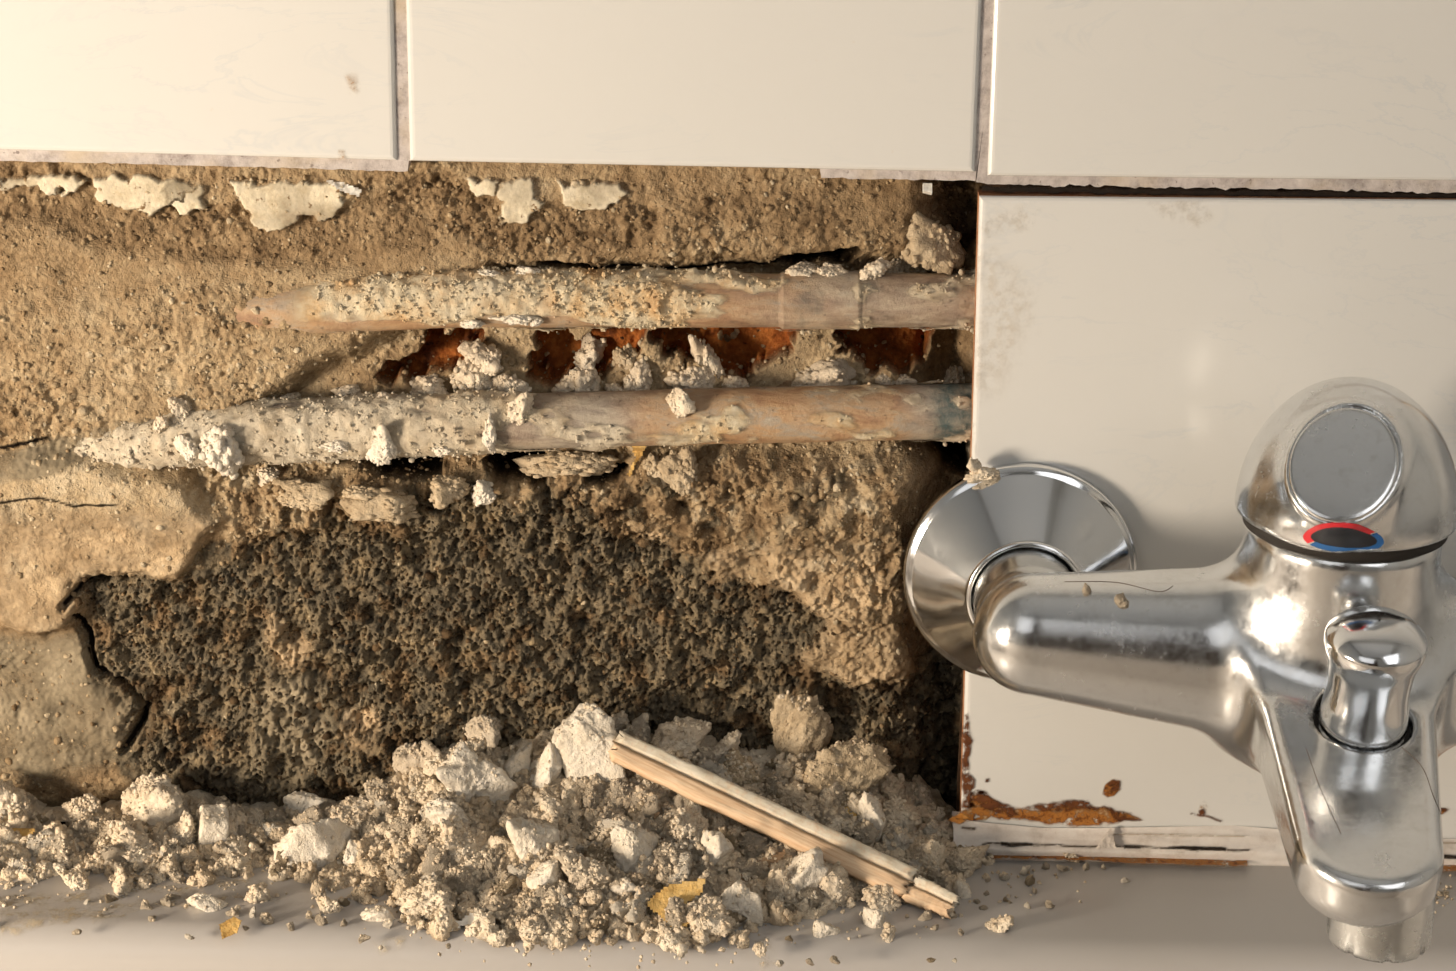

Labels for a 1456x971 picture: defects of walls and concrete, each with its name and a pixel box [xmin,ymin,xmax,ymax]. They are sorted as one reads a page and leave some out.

corrosion [378,328,485,381]
corrosion [528,327,798,383]
corrosion [834,327,932,371]
spalling [0,161,985,774]
crack [63,574,151,748]
water stain [0,472,962,807]
spalling [0,671,257,823]
spalling [298,742,365,801]